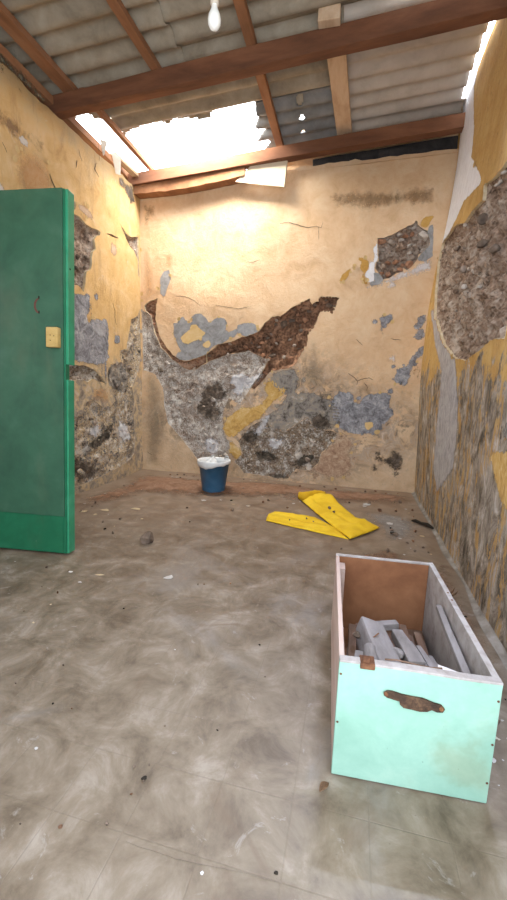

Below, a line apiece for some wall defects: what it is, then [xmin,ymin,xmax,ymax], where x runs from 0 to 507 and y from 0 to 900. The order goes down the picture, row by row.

spalling [69,161,507,487]